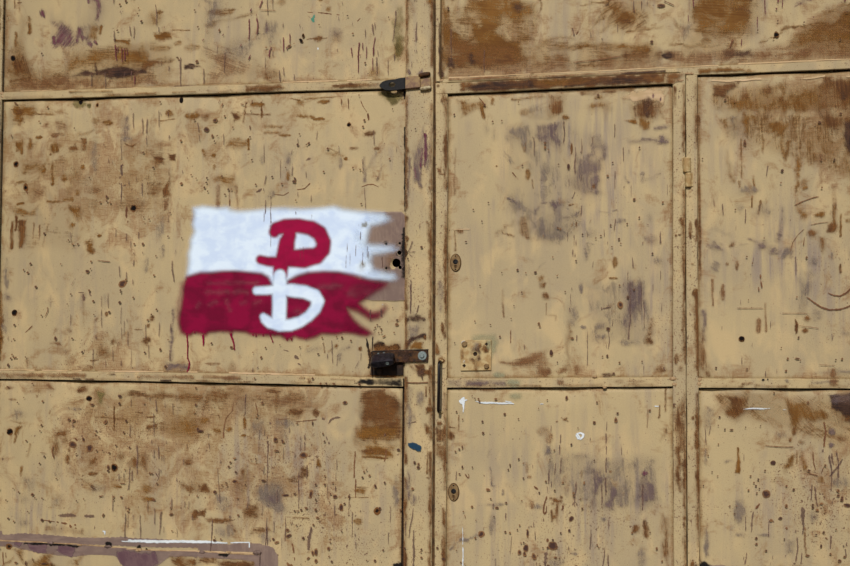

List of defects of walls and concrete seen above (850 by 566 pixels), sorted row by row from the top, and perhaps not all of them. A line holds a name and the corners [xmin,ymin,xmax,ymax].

rust [503,350,578,385]
rust [357,383,401,459]